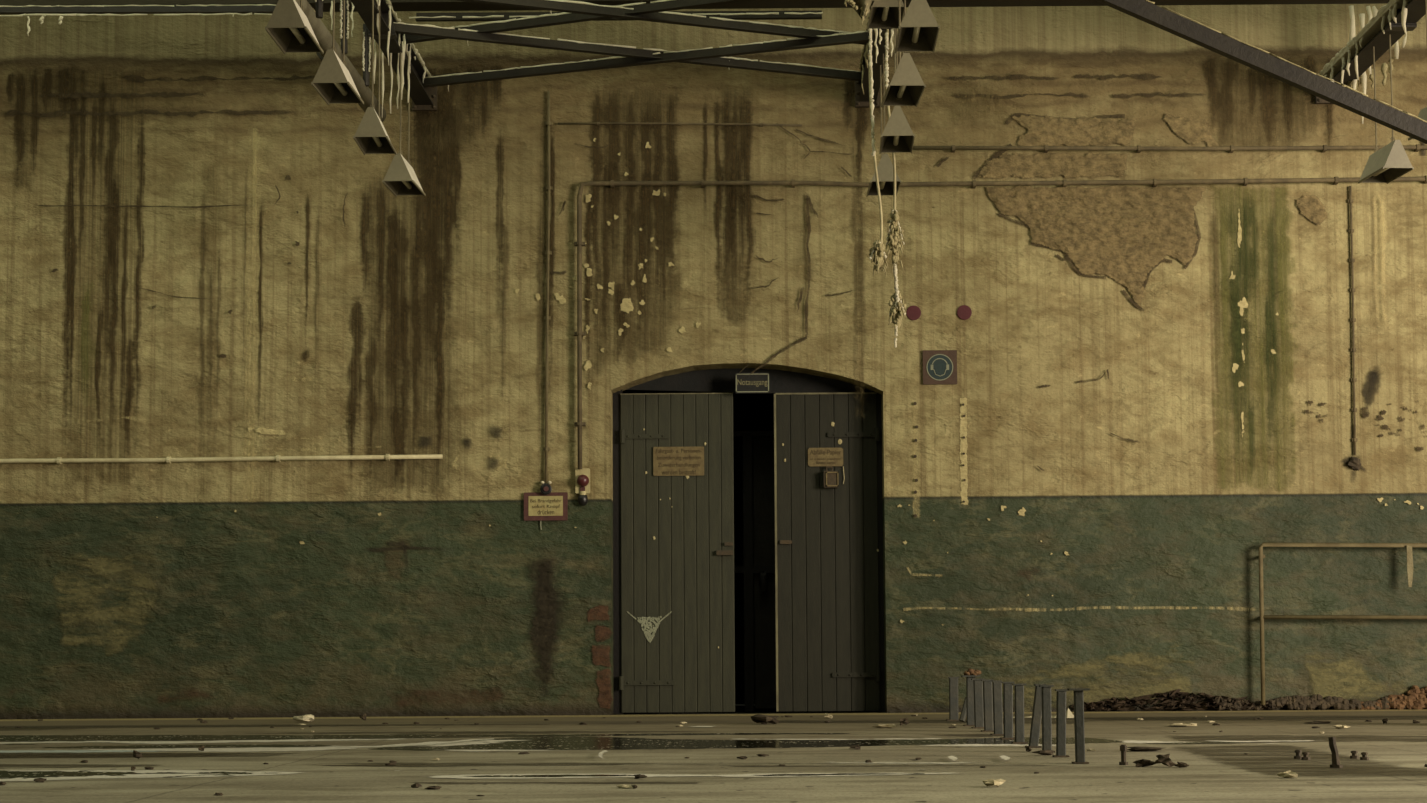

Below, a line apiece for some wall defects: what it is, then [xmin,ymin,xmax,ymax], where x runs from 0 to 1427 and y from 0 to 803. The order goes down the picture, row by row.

spalling [1005,113,1135,146]
spalling [986,185,1205,311]
water stain [1213,202,1279,466]